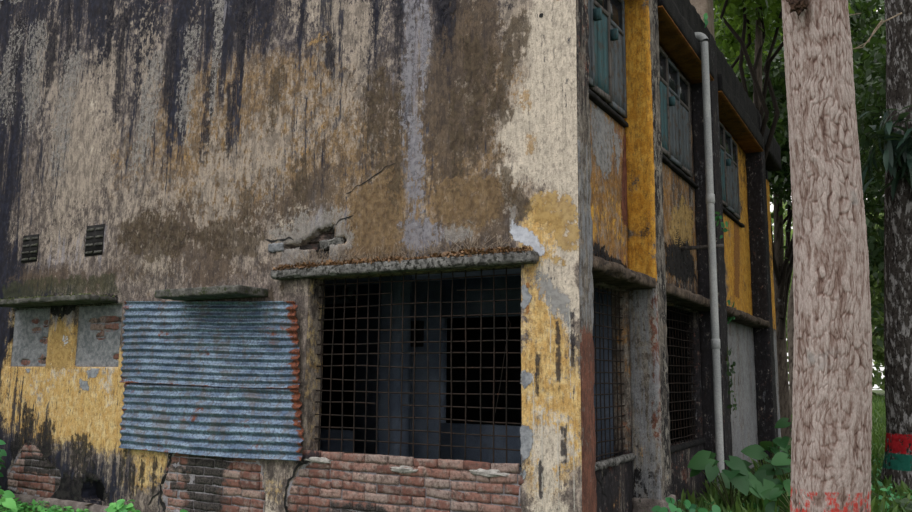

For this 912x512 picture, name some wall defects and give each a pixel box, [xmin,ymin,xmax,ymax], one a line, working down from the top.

leakage [104,0,130,122]
leakage [361,0,530,257]
peeling [592,104,622,179]
leakage [118,185,266,263]
flaking render [268,227,347,261]
leakage [495,158,545,256]
peeling [21,314,76,373]
flaking render [89,316,122,340]
flaking render [520,284,532,309]
flaking render [521,370,532,389]
leakage [10,404,95,502]
leakage [119,449,158,502]